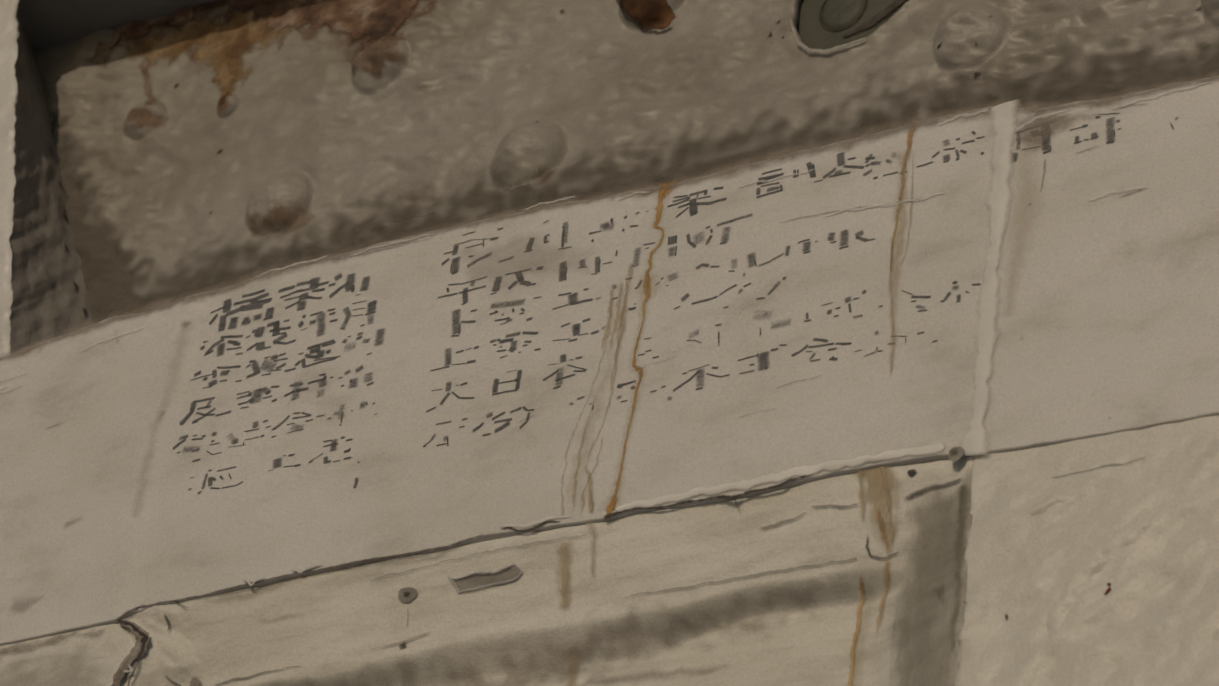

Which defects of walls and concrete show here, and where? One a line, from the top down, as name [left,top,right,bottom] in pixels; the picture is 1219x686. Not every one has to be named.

corrosion [89,0,434,141]
corrosion [616,0,677,34]
corrosion [890,121,915,273]
corrosion [859,466,894,541]
spalling [451,563,521,592]
corrosion [560,542,568,607]
damp [951,486,966,647]
corrosion [848,579,864,686]